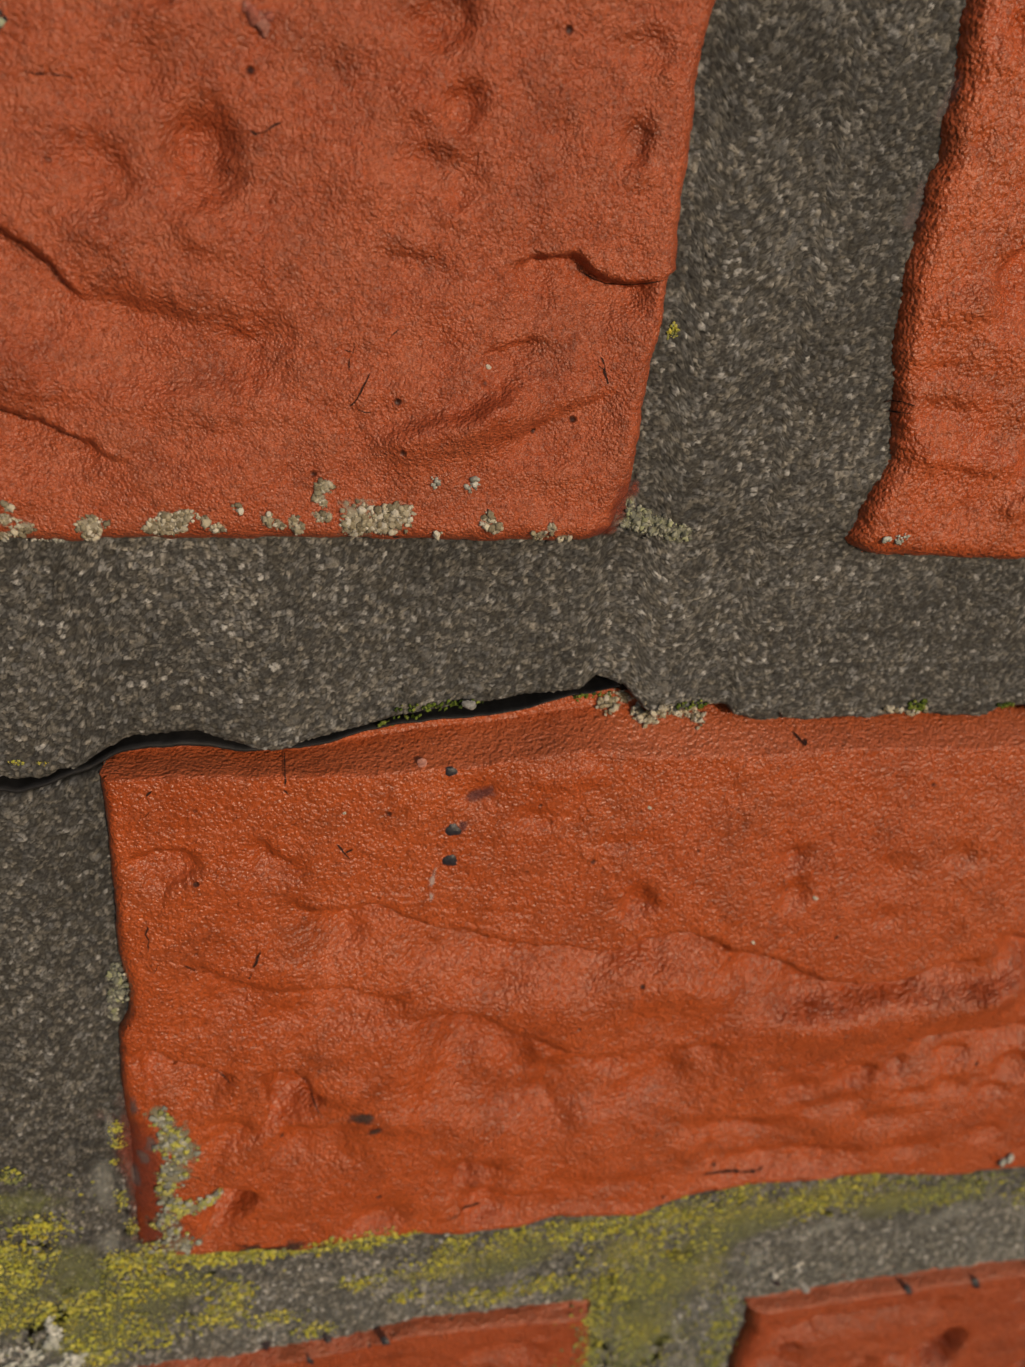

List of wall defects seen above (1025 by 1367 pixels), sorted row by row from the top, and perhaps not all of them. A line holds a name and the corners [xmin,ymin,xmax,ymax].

crack [594,675,628,691]